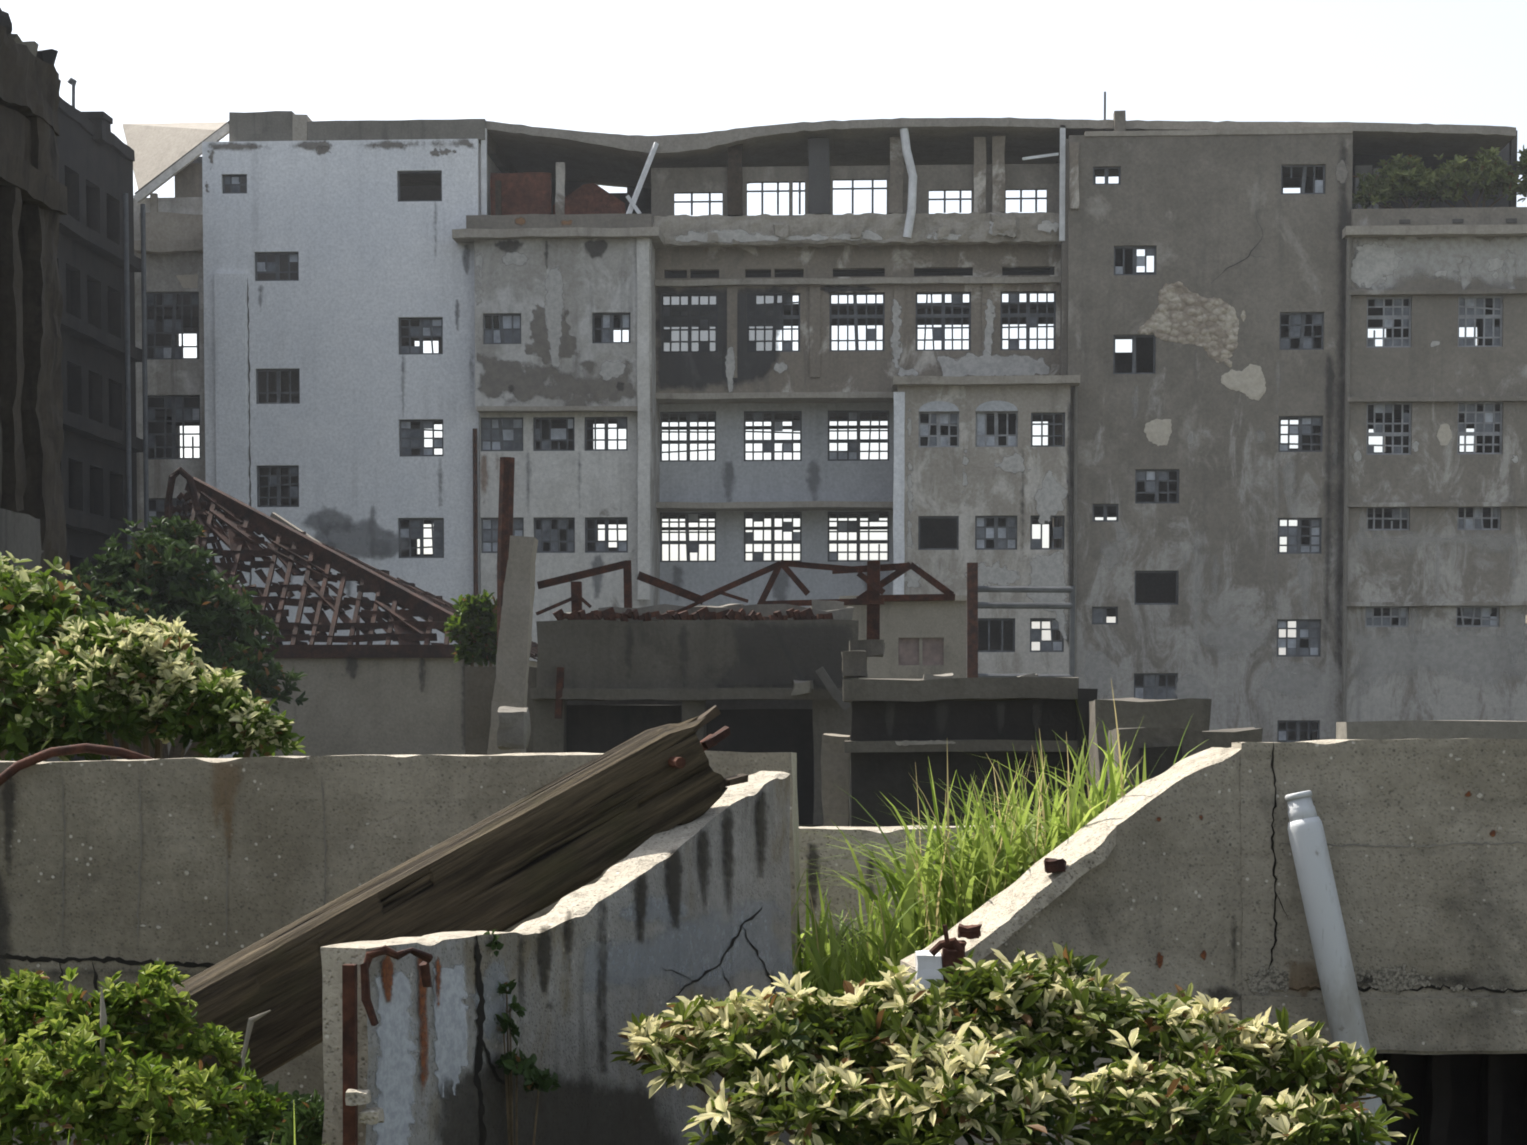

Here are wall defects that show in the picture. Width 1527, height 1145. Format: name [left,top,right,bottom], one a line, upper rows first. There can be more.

peeling [675,229,883,243]
peeling [1038,220,1059,233]
peeling [476,267,635,406]
spalling [1137,281,1246,367]
corrosion [552,606,833,622]
damp [636,875,648,942]
damp [666,809,734,927]
damp [756,792,767,871]
crack [1245,742,1527,993]
corrosion [382,956,394,1002]
corrosion [418,958,442,1086]
crack [661,908,776,1002]